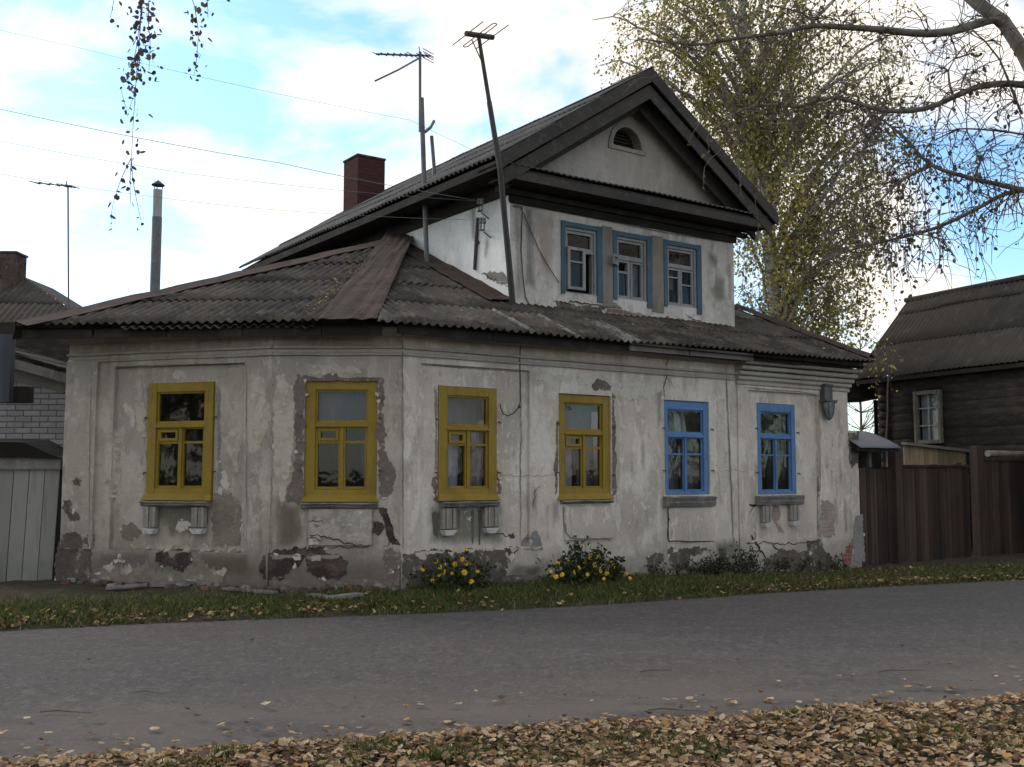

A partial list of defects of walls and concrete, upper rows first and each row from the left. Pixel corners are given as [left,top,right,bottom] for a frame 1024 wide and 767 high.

flaking render [54,387,244,586]
crack [308,340,404,549]
peeling [259,363,544,591]
flaking render [591,379,618,496]
flaking render [646,546,727,575]
crack [720,364,821,558]
flaking render [763,500,865,573]